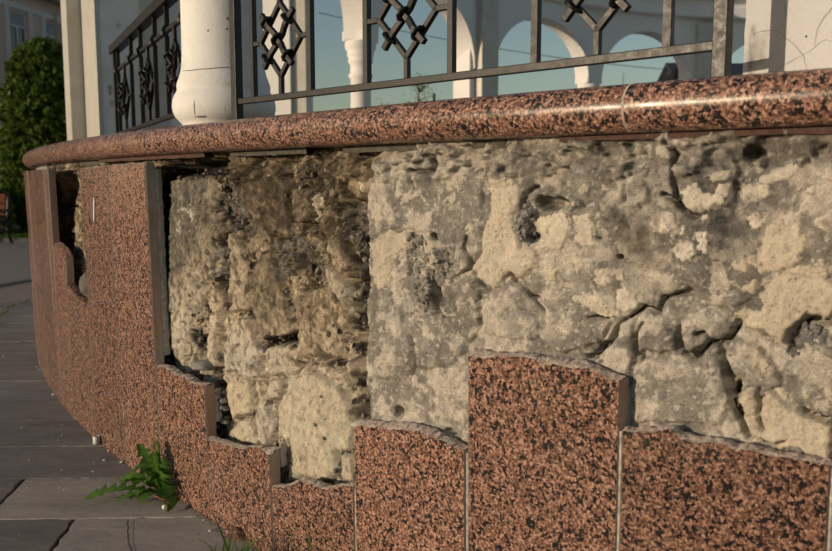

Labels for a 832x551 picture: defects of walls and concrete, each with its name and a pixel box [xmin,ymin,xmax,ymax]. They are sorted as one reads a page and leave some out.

crack [749,3,832,73]
spalling [53,241,73,260]
peeling [175,197,195,235]
peeling [311,192,324,222]
peeling [334,203,461,317]
peeling [473,177,596,290]
peeling [645,163,832,357]
peeling [572,267,644,323]
spalling [157,364,214,386]
spalling [469,348,626,381]
spalling [208,410,279,455]
peeling [622,387,832,466]